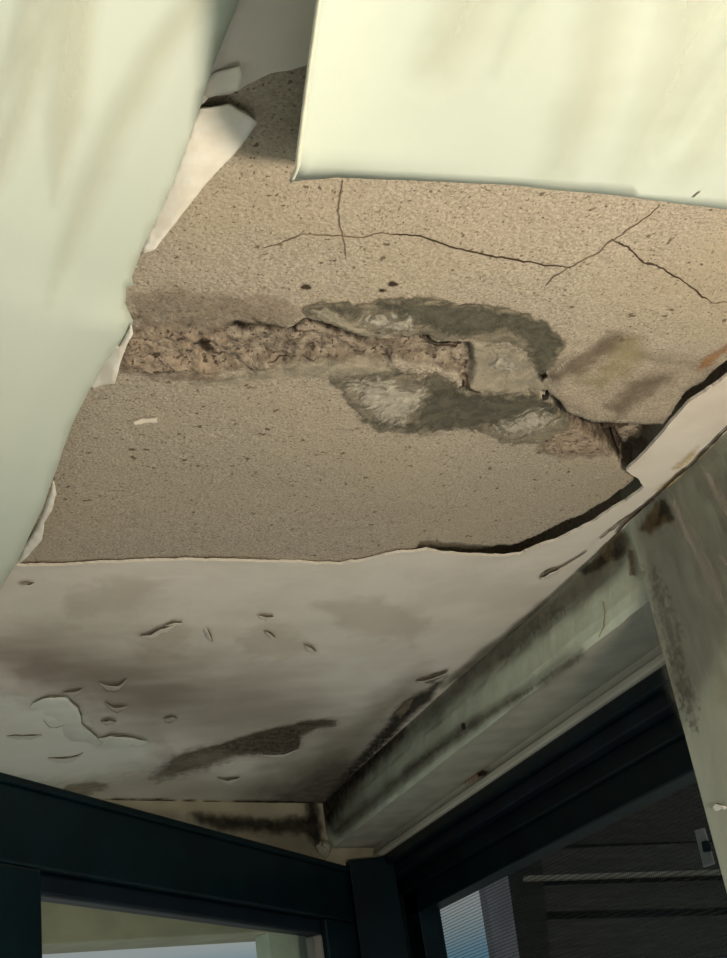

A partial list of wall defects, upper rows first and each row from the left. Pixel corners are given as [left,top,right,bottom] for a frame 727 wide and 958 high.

crack [263,181,727,304]
spalling [0,0,727,589]
water stain [311,300,636,382]
water stain [348,377,560,436]
water stain [613,377,668,413]
water stain [640,444,727,696]
peeling [30,678,147,764]
peeling [156,720,336,780]
water stain [194,531,635,852]